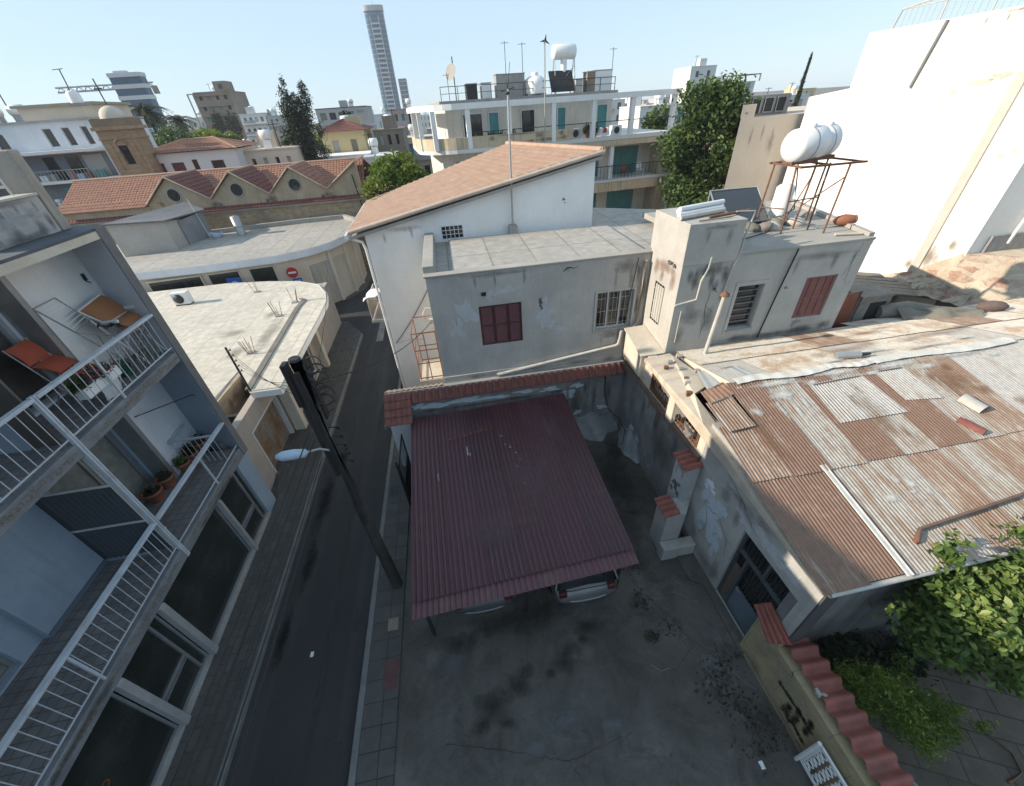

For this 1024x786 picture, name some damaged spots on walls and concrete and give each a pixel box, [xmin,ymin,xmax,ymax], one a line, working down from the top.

peeling [450,297,479,337]
peeling [694,478,805,590]